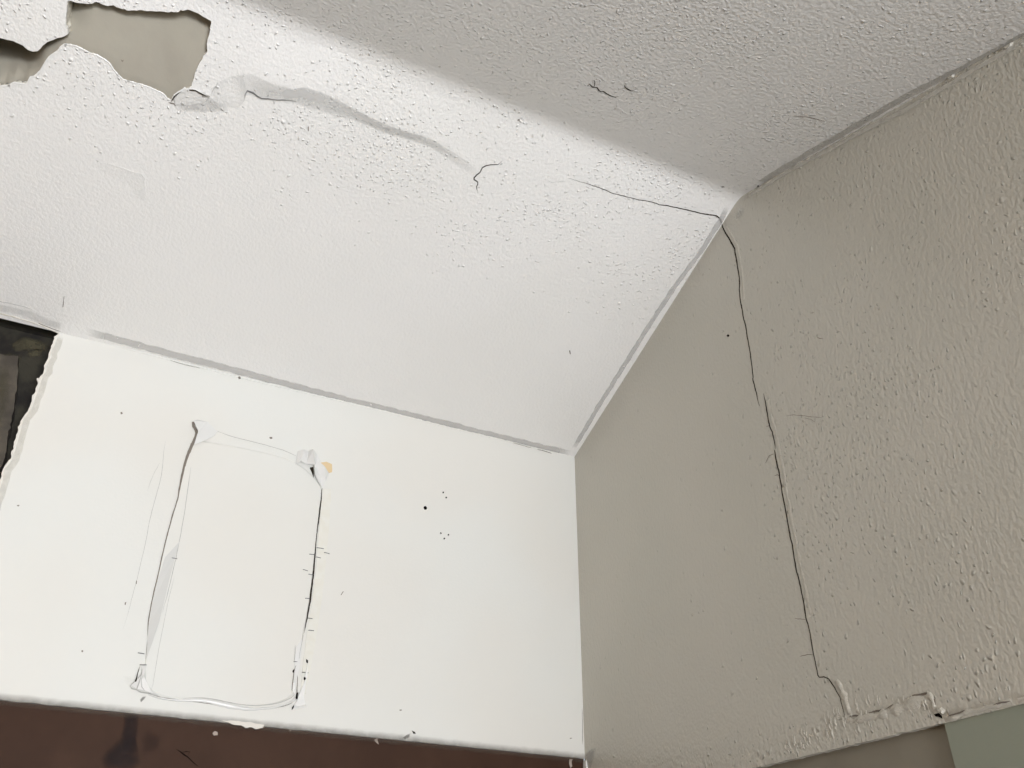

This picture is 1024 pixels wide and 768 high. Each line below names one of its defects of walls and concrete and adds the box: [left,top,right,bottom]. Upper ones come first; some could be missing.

peeling [0,0,211,106]
crack [473,162,501,193]
crack [549,179,851,716]